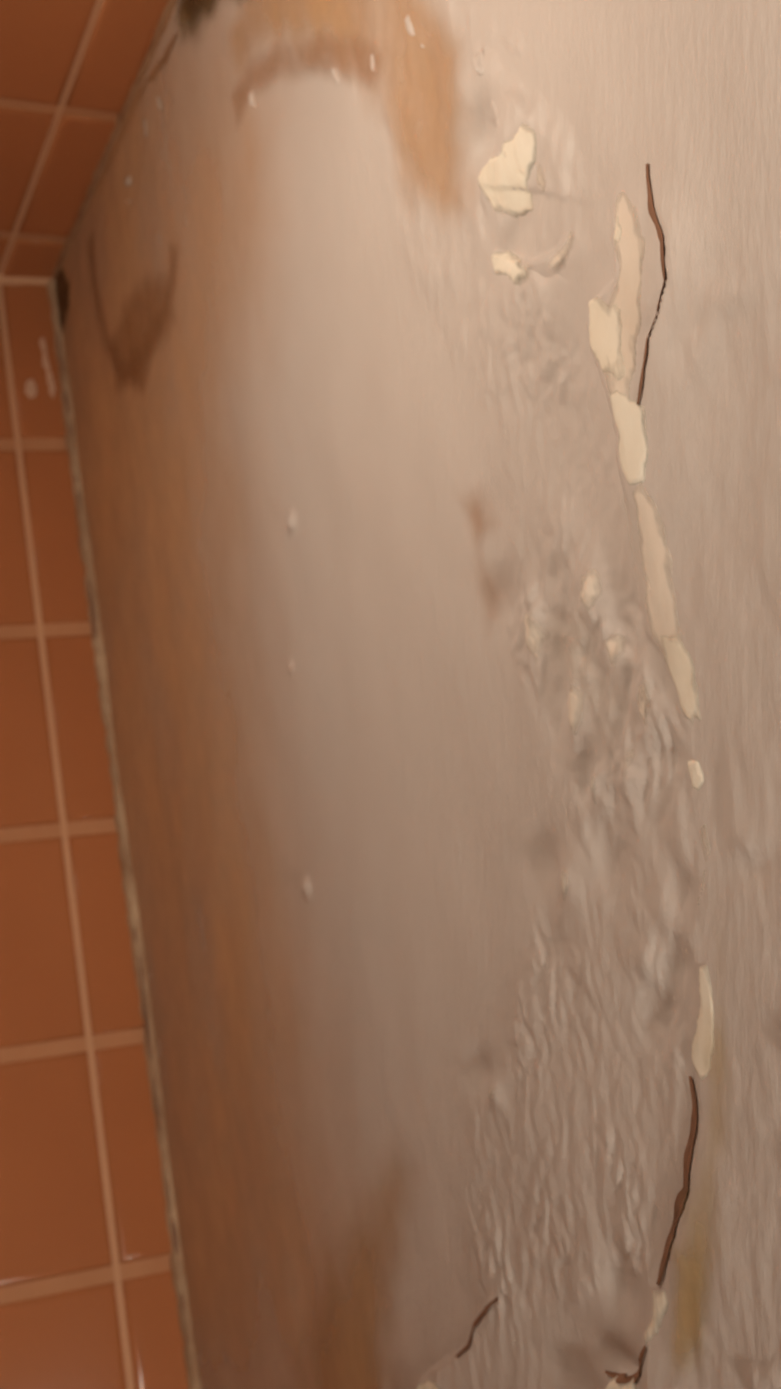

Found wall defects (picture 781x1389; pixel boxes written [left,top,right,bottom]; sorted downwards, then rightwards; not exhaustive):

water stain [179,0,214,32]
crack [637,163,665,405]
peeling [234,0,781,1389]